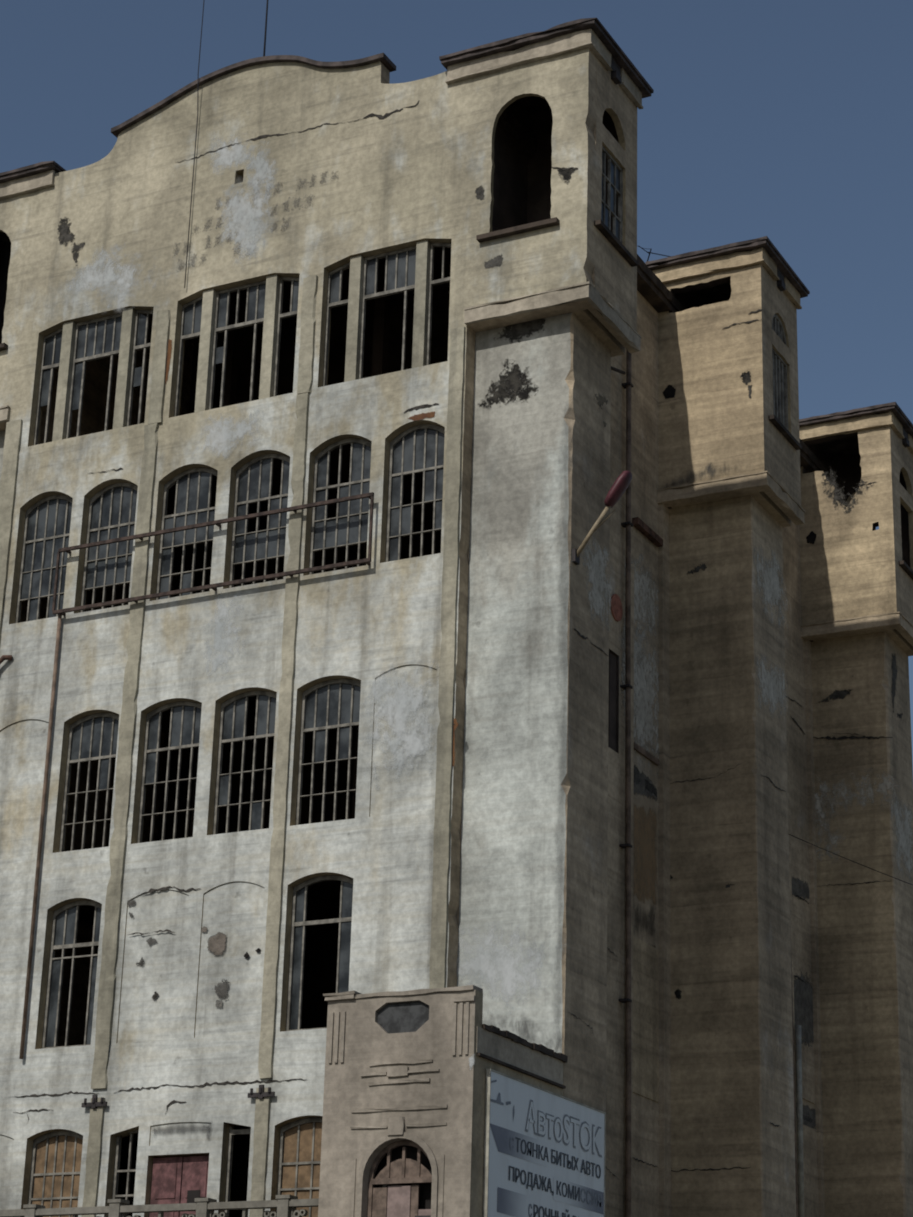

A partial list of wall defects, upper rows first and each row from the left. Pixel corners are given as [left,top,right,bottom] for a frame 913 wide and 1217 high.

crack [180,101,419,162]
peeling [58,217,85,266]
peeling [497,318,545,343]
peeling [479,359,538,409]
spalling [821,469,875,513]
peeling [201,927,227,955]
peeling [215,979,231,1008]
crack [12,1078,307,1120]